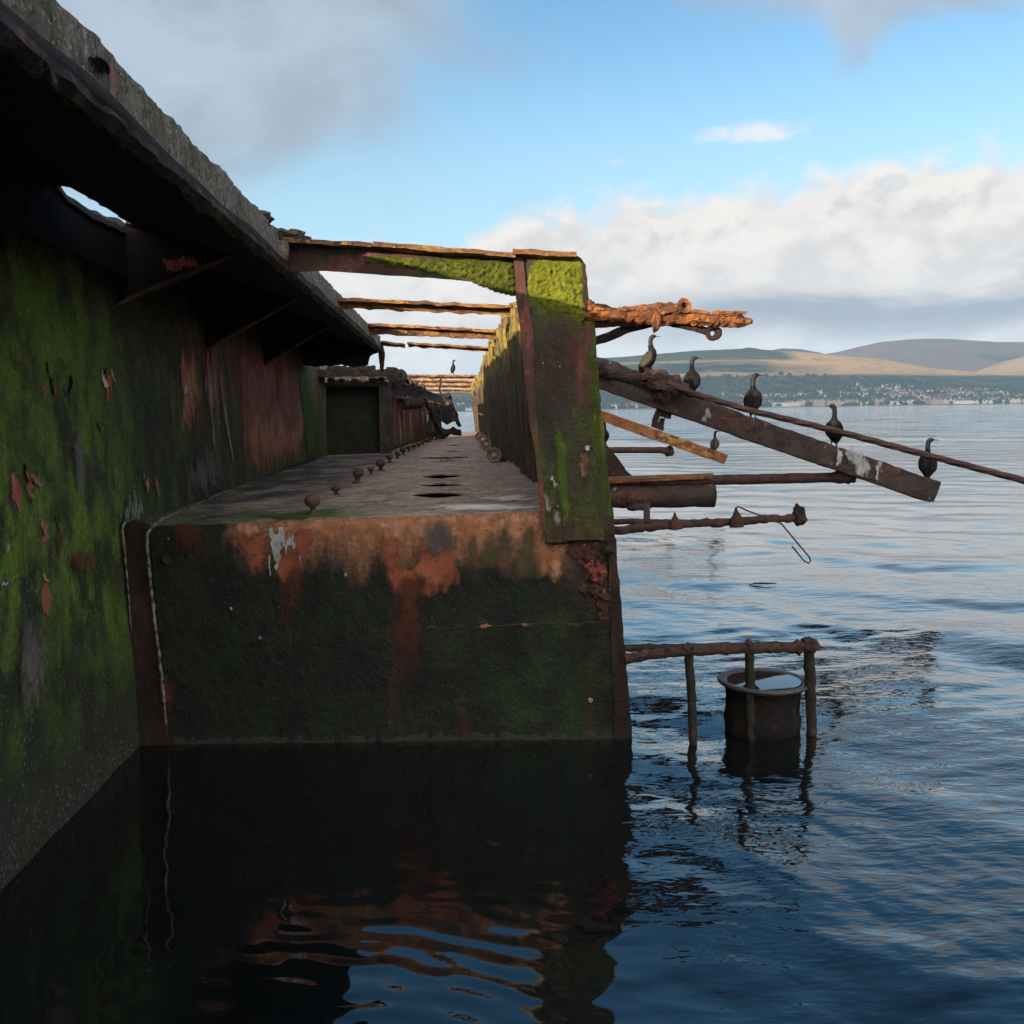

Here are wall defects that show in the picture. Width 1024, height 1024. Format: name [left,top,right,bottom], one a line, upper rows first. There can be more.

peeling [101,369,116,402]
rust [180,348,219,430]
rust [240,362,305,472]
peeling [11,471,43,513]
water stain [120,488,143,522]
water stain [20,620,45,708]
rust [228,512,563,671]
crack [372,621,605,633]